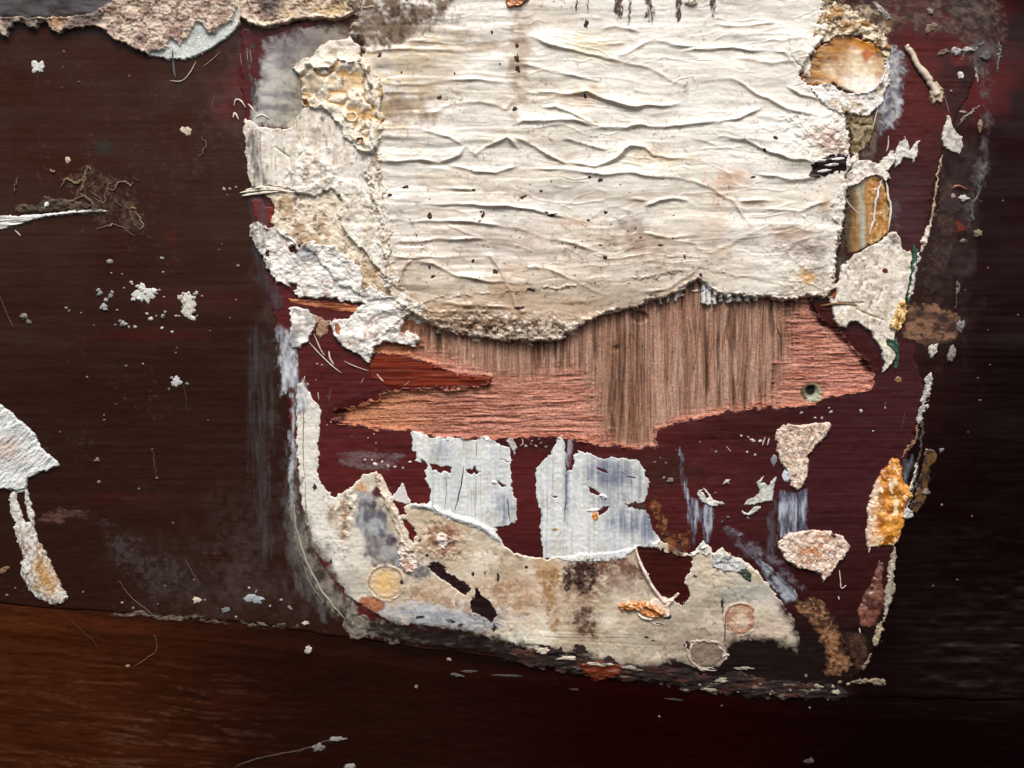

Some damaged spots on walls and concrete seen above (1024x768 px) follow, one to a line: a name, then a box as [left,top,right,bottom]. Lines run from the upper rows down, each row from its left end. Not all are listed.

peeling [0,404,60,491]
peeling [742,422,832,516]
peeling [390,483,411,505]
peeling [697,488,725,507]
peeling [691,540,752,582]
peeling [618,549,680,621]
peeling [522,639,644,671]